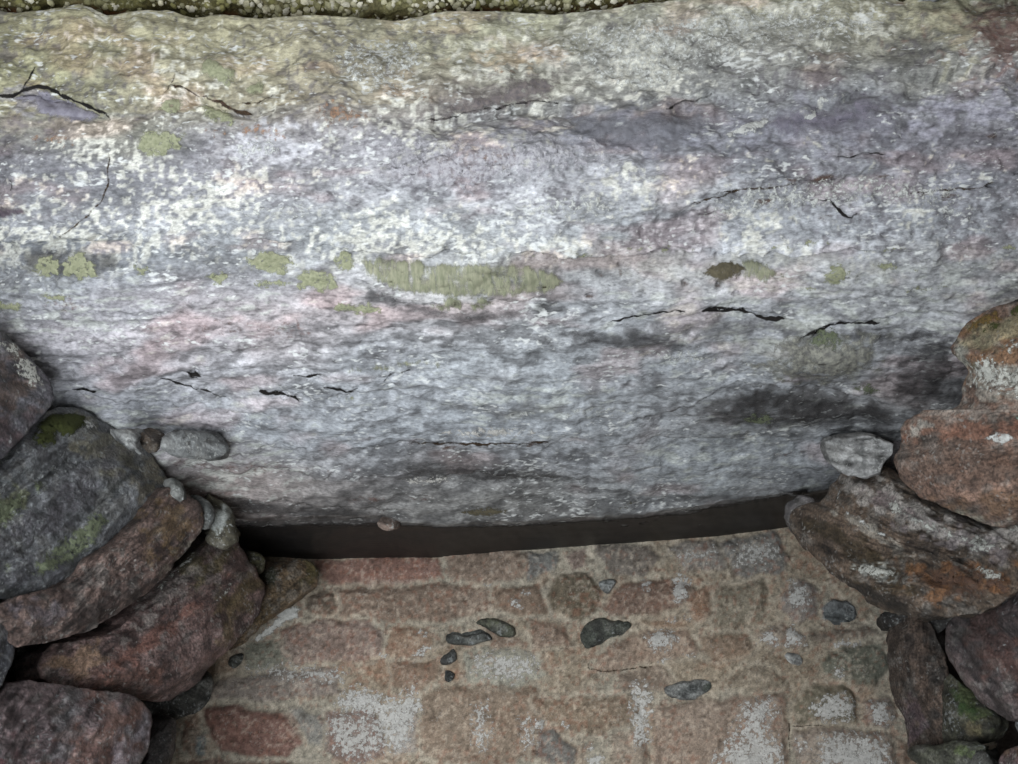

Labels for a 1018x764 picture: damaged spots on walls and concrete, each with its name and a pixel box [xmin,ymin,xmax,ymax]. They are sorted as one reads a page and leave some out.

crack [0,67,109,118]
crack [612,306,784,322]
crack [804,320,879,337]